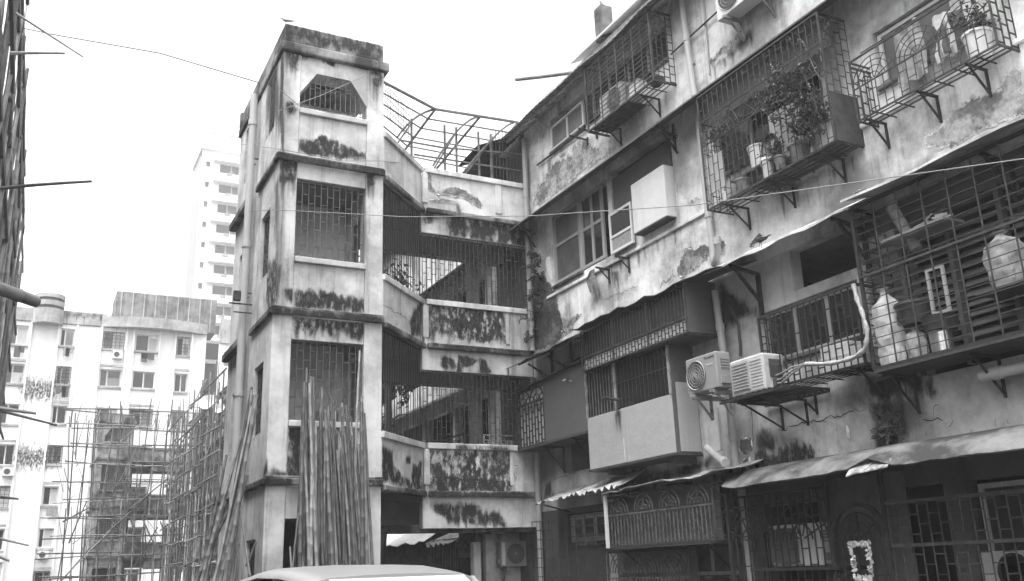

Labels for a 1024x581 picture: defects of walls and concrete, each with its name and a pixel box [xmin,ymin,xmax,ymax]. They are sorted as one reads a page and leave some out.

peeling [923,67,1024,150]
leakage [266,52,383,340]
peeling [531,138,611,205]
peeling [676,239,727,278]
leakage [410,303,550,374]
crack [779,408,860,431]
mould [369,445,530,527]